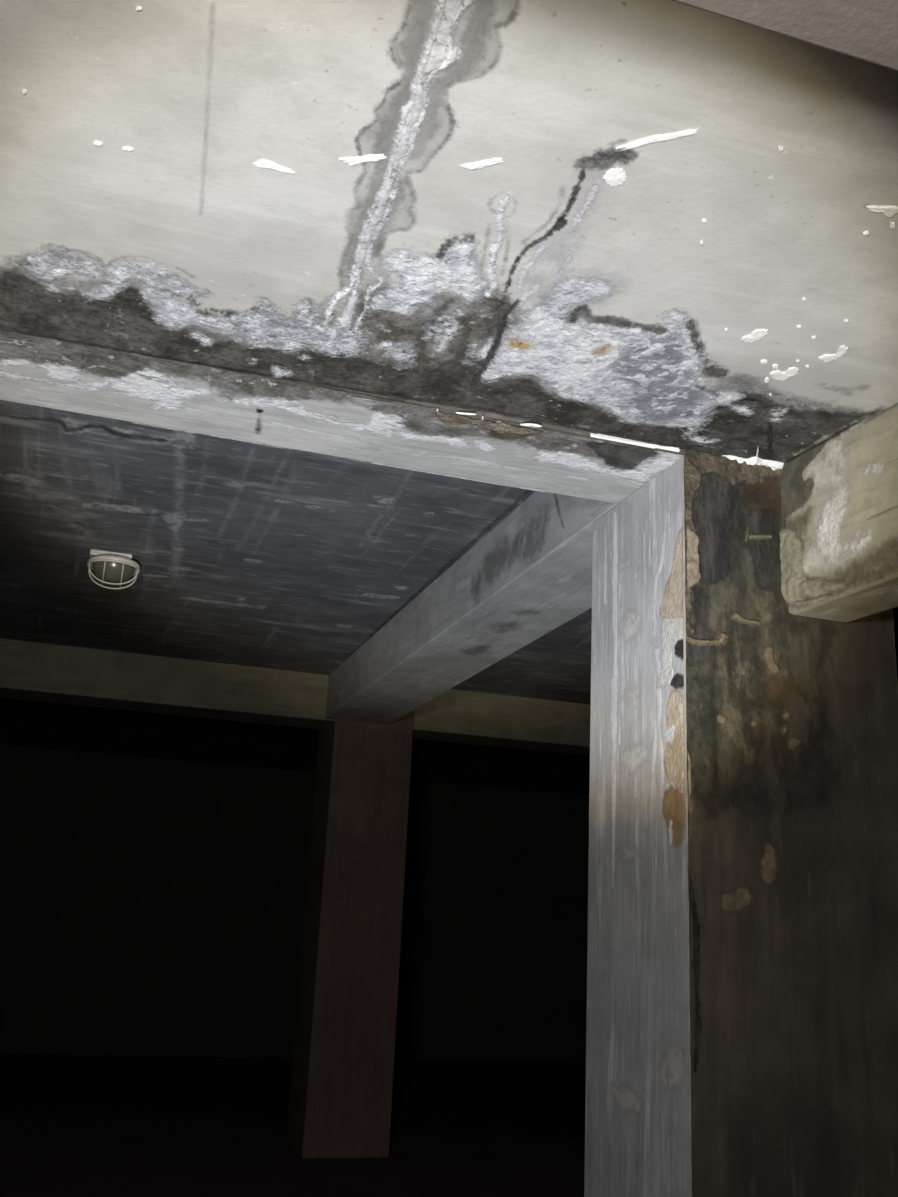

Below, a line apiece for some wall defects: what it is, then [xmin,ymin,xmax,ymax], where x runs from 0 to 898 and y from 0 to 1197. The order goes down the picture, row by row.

crack [20,417,197,449]
damp [0,0,898,813]
crack [470,147,638,390]
flaking render [659,449,781,846]